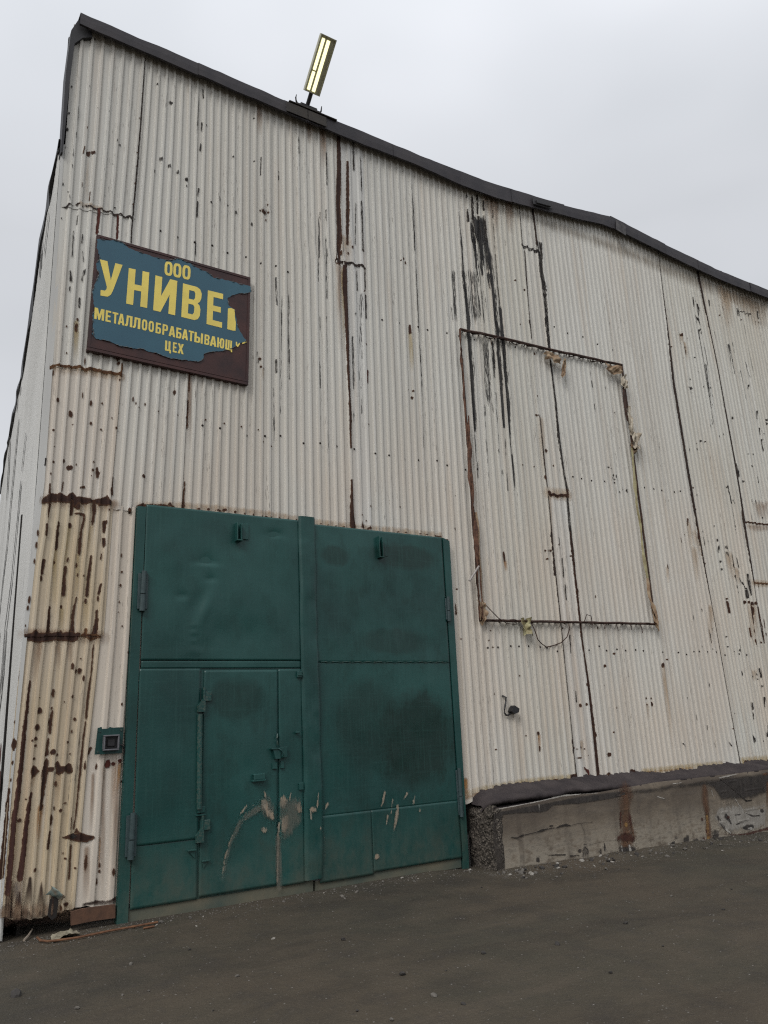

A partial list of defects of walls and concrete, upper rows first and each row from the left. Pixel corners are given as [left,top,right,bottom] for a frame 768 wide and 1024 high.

corrosion [335,236,363,305]
corrosion [24,459,115,653]
corrosion [681,518,767,644]
corrosion [0,671,122,921]
corrosion [617,785,636,852]
spalling [716,806,768,835]